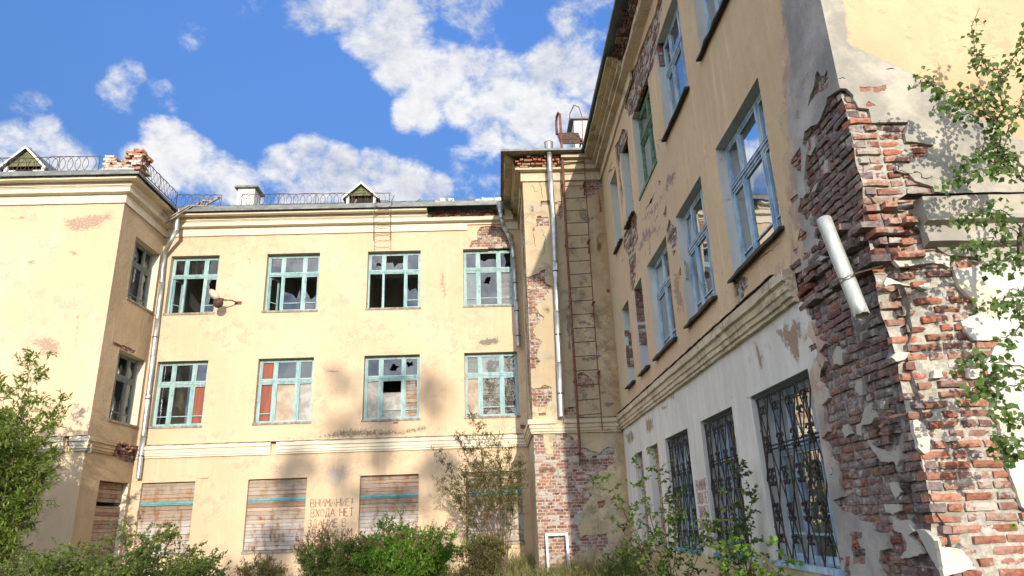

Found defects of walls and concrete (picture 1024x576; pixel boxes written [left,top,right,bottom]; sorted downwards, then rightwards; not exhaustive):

flaking render [612,0,665,116]
flaking render [430,201,615,571]
flaking render [624,214,647,367]
flaking render [789,74,1024,576]